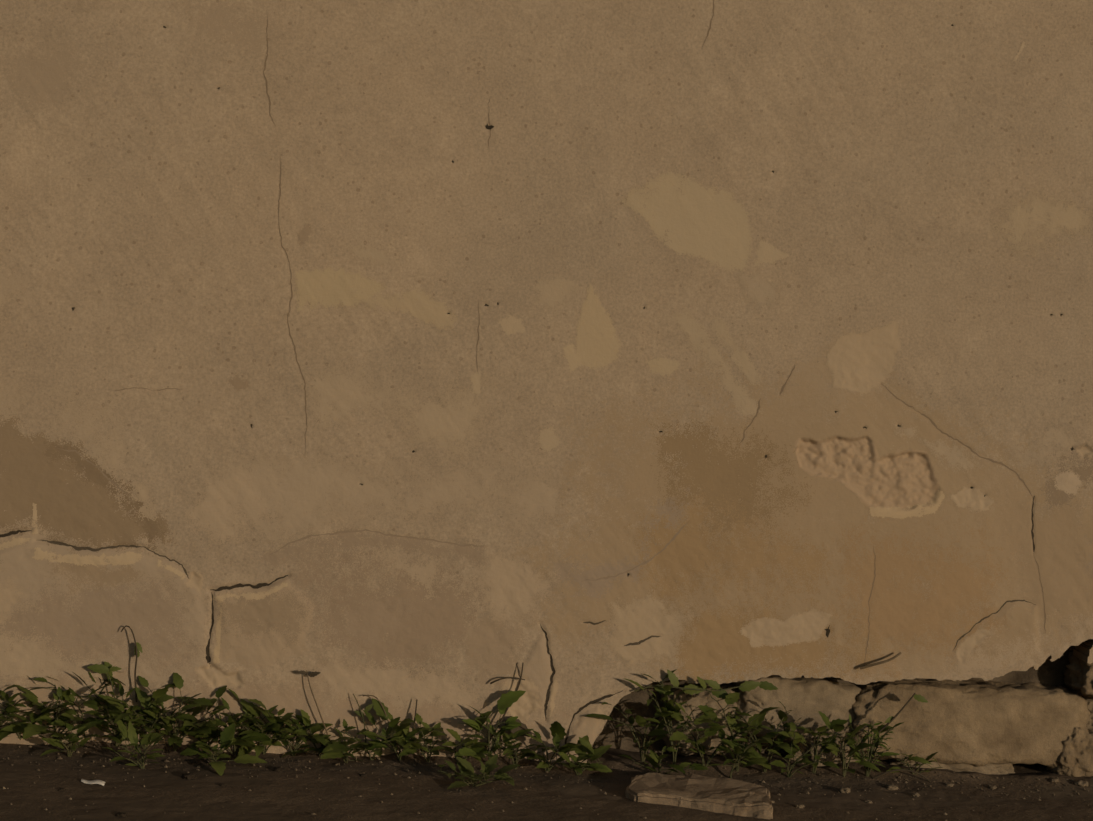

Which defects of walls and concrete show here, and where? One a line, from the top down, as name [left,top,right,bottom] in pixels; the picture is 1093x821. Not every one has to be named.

crack [263,16,275,124]
crack [278,171,307,454]
spalling [869,486,994,520]
crack [883,385,1046,649]
crack [0,529,485,666]
water stain [0,415,581,762]
crack [540,624,622,762]
peeling [598,592,700,670]
spalling [738,607,833,648]
peeling [1047,612,1093,663]